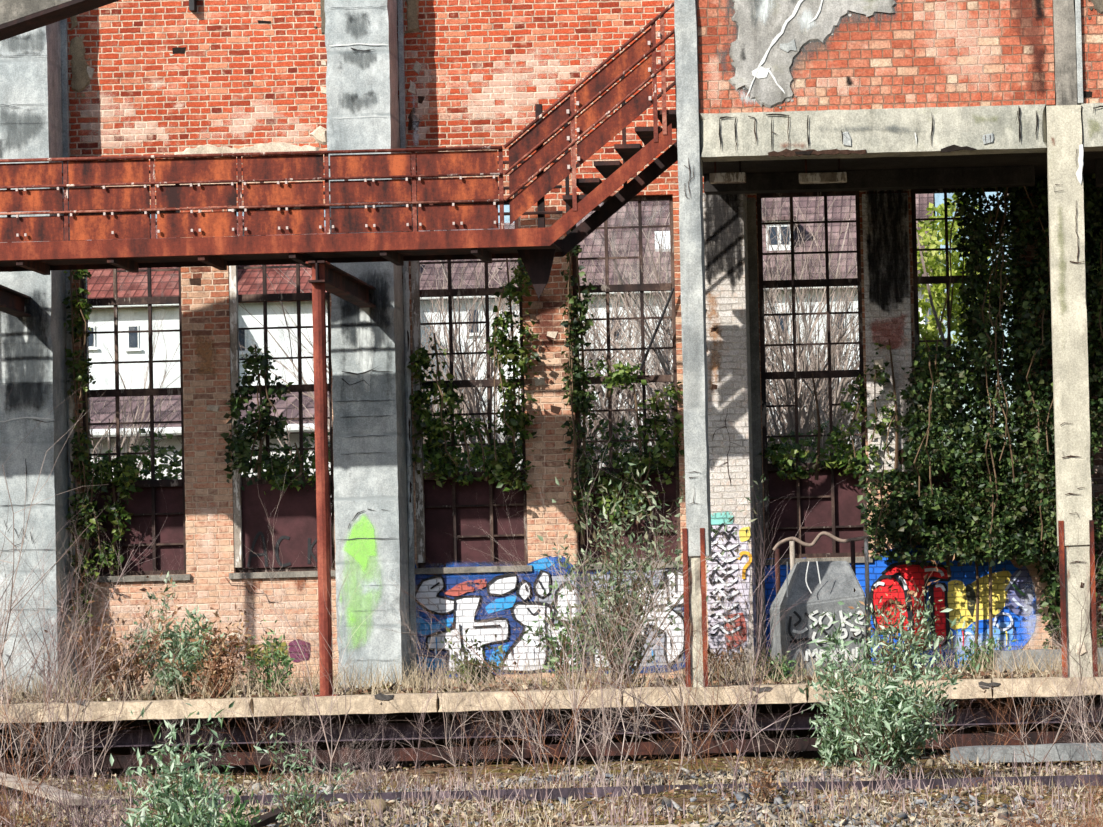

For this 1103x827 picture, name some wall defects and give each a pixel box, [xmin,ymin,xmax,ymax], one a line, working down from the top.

flaking render [1088,0,1103,20]
damp [347,13,369,35]
damp [343,50,376,68]
flaking render [727,0,897,109]
damp [342,91,377,111]
damp [0,111,41,157]
spalling [768,130,867,157]
spalling [940,133,994,152]
damp [3,291,48,411]